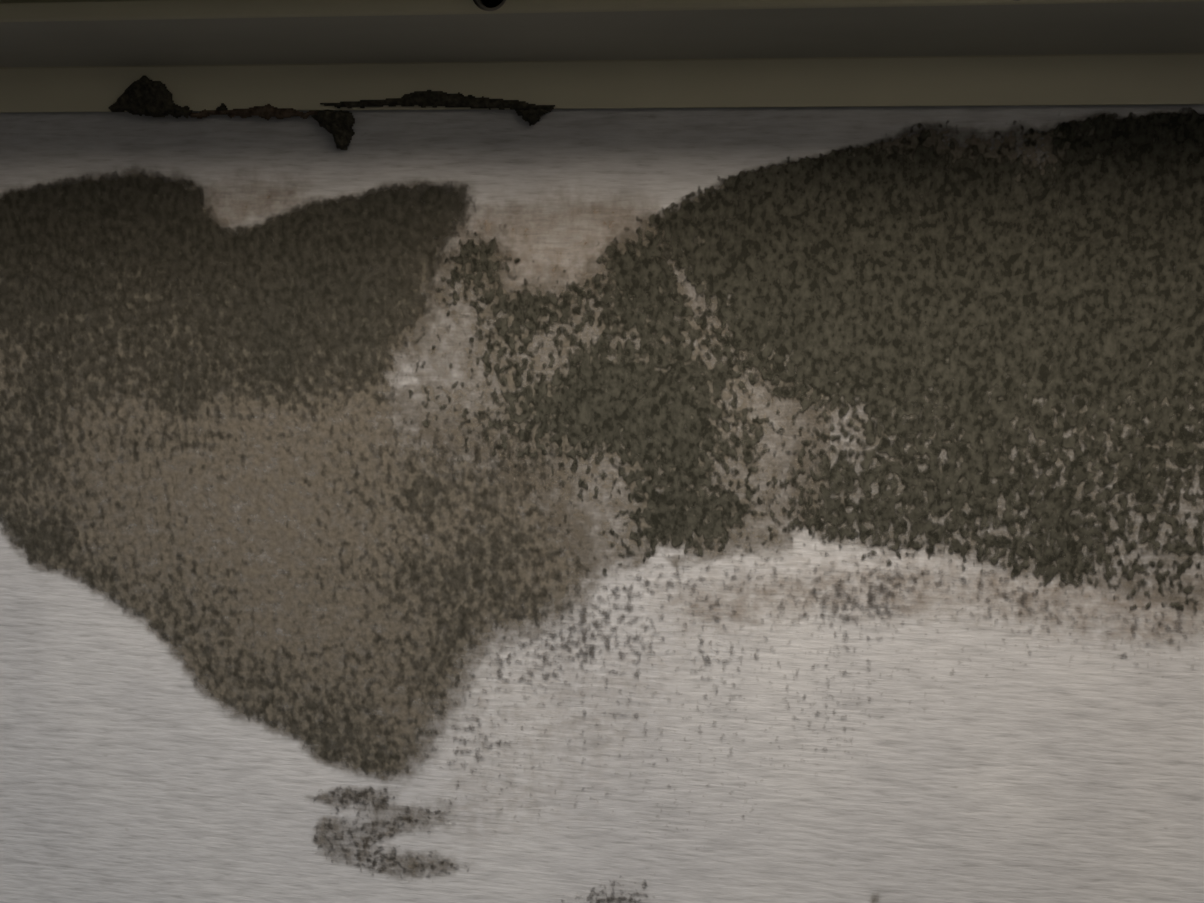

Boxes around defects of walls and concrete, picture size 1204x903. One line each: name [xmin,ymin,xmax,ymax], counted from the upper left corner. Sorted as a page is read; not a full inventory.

water stain [0,108,1204,780]
water stain [315,787,453,876]